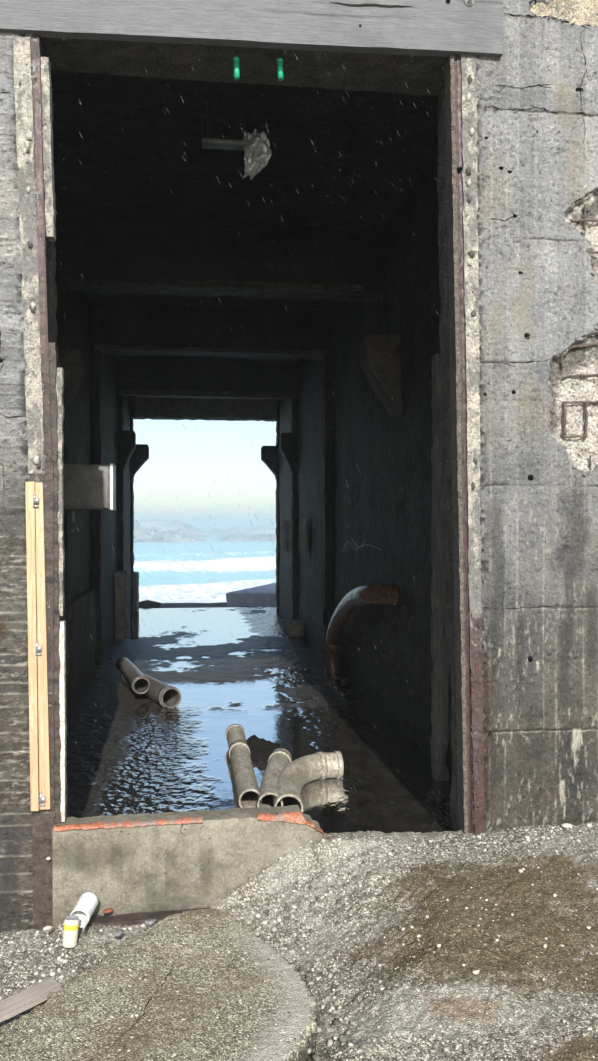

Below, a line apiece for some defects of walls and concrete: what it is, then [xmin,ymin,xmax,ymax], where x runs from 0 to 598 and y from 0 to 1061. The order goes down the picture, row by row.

crack [487,0,596,142]
spalling [529,0,598,27]
spalling [564,189,598,282]
spalling [546,330,598,477]